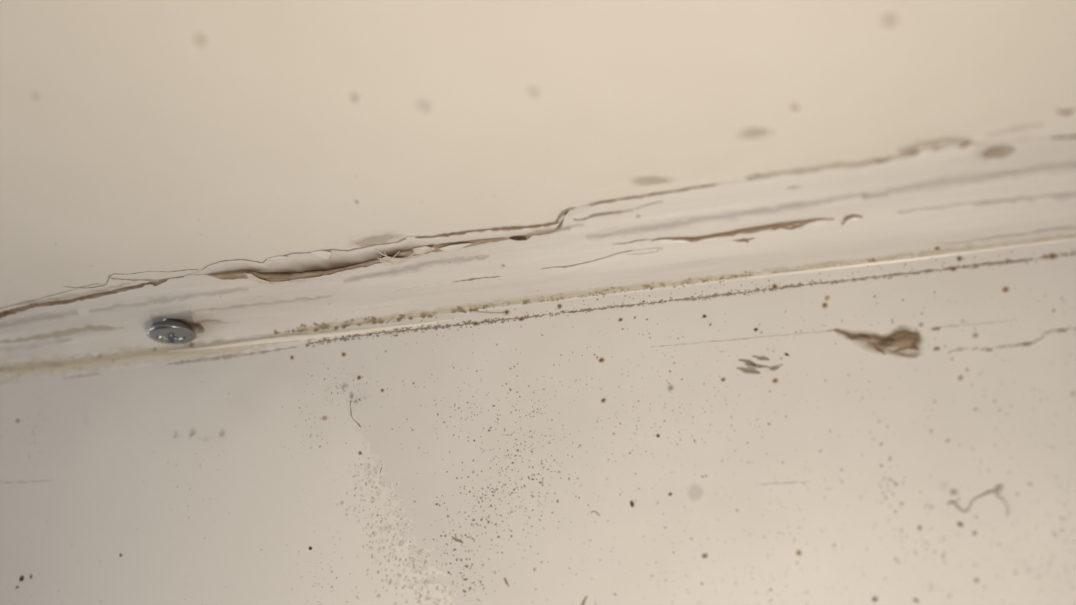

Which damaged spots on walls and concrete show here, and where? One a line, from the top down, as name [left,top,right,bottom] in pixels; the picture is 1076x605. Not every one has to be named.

crack [0,184,716,318]
crack [615,215,863,244]
peeling [0,365,469,605]